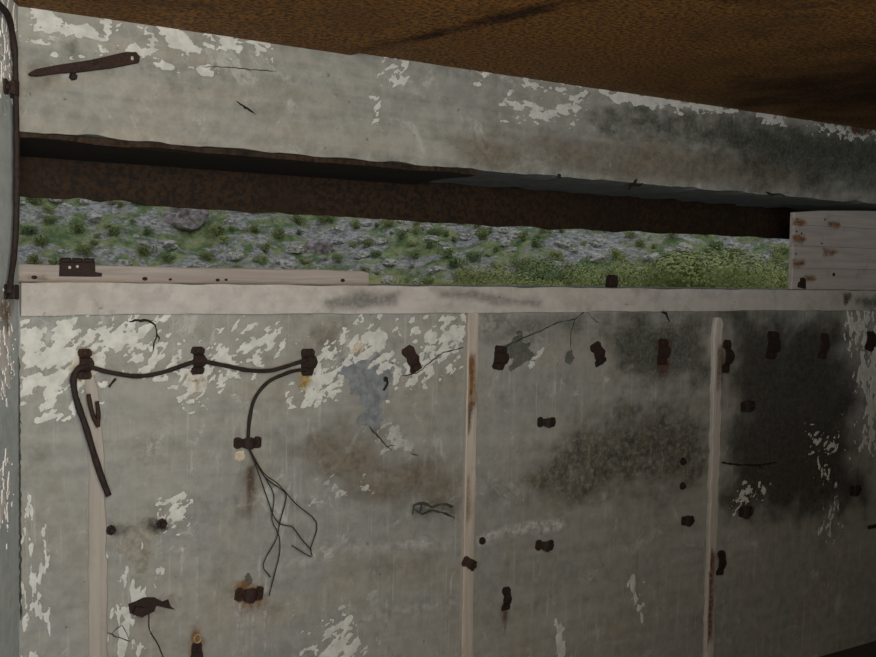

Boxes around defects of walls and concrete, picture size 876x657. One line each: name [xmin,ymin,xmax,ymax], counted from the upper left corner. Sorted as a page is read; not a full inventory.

peeling [0,0,273,105]
peeling [499,78,588,129]
peeling [599,89,739,117]
leakage [632,106,876,188]
peeling [0,289,297,424]
leakage [723,312,866,513]
peeling [805,310,876,545]
peeling [0,448,14,532]
peeling [299,605,380,657]